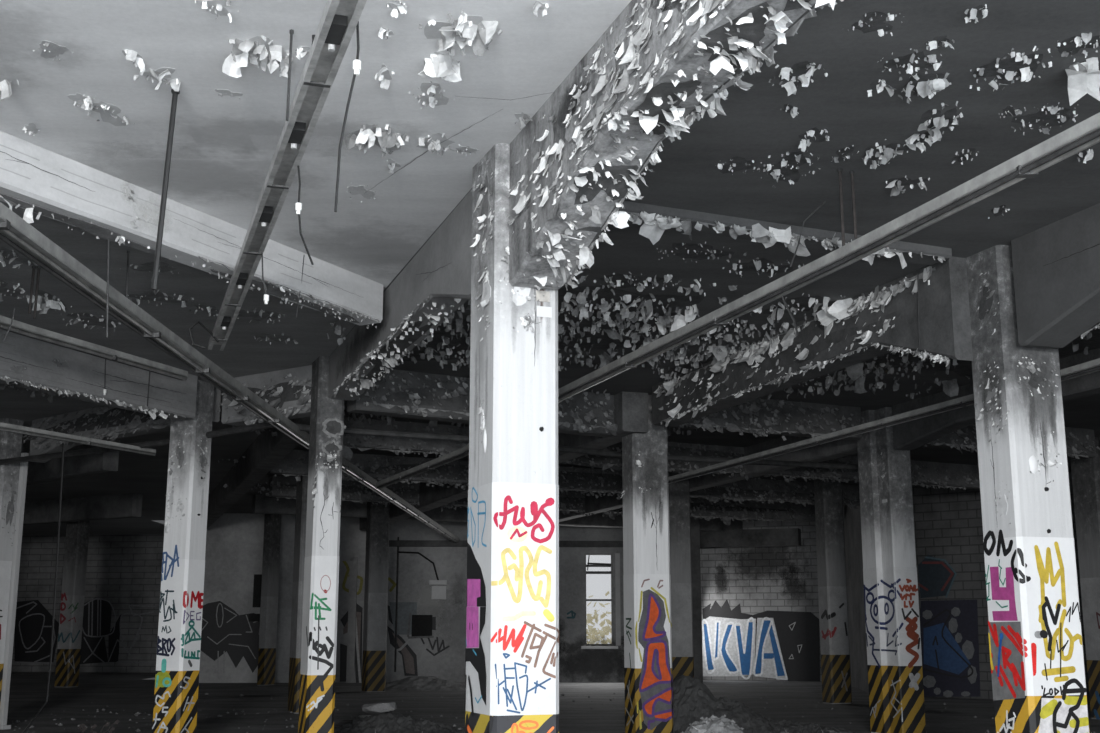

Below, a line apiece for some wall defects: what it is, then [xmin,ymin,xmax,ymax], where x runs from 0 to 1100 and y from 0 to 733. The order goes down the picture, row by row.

peeling [848,11,904,36]
peeling [964,4,988,23]
peeling [222,35,310,78]
peeling [0,79,19,100]
peeling [68,93,135,126]
peeling [718,36,963,186]
peeling [970,32,1100,135]
peeling [1076,149,1094,163]
peeling [885,176,930,196]
peeling [237,0,852,519]
peeling [641,247,1100,525]
peeling [0,376,186,449]